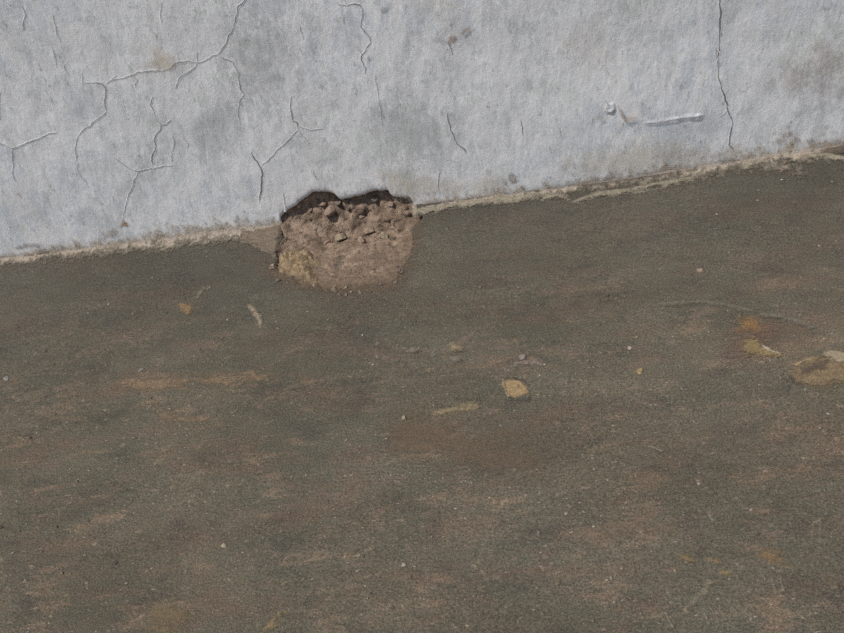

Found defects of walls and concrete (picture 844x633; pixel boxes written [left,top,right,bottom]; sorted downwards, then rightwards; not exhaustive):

crack [0,132,57,181]
crack [51,0,246,221]
crack [250,96,324,203]
crack [336,0,384,125]
crack [713,0,739,159]